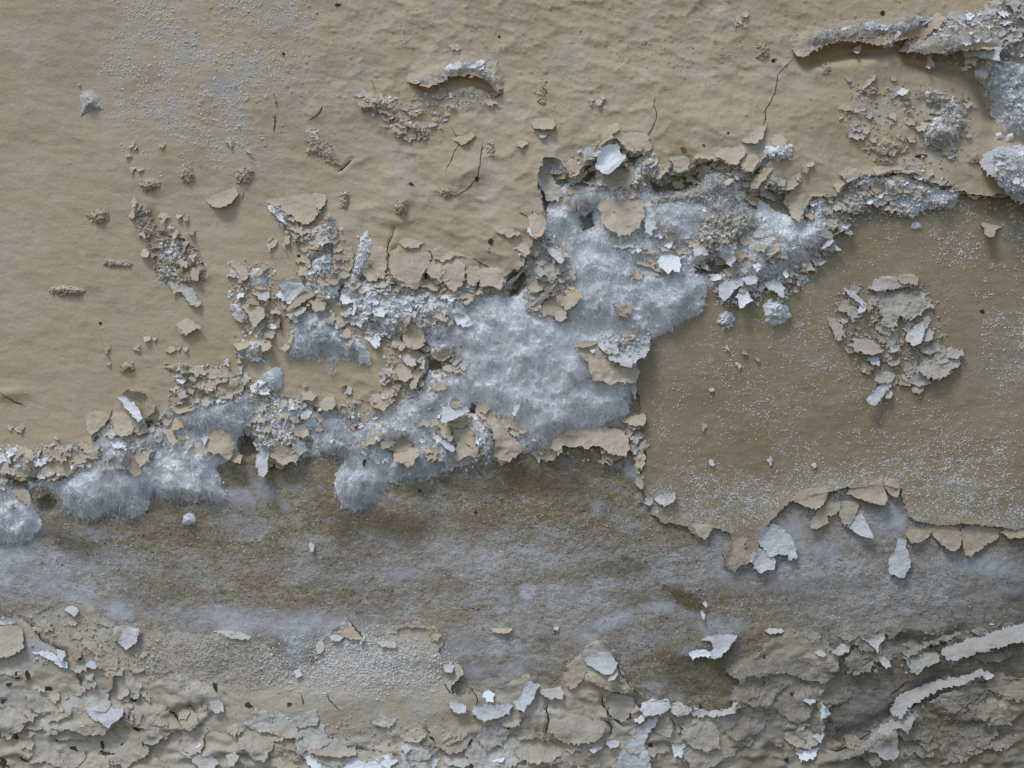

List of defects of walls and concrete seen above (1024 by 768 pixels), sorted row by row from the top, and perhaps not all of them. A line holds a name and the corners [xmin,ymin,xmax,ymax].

peeling [885,0,1024,86]
damp [802,0,1024,201]
peeling [206,186,238,208]
peeling [979,144,1024,205]
peeling [0,193,676,508]
damp [0,152,959,605]
peeling [826,273,964,406]
peeling [727,523,798,573]
peeling [792,478,900,538]
peeling [888,524,1024,578]
damp [572,588,741,639]
peeling [0,605,1024,768]